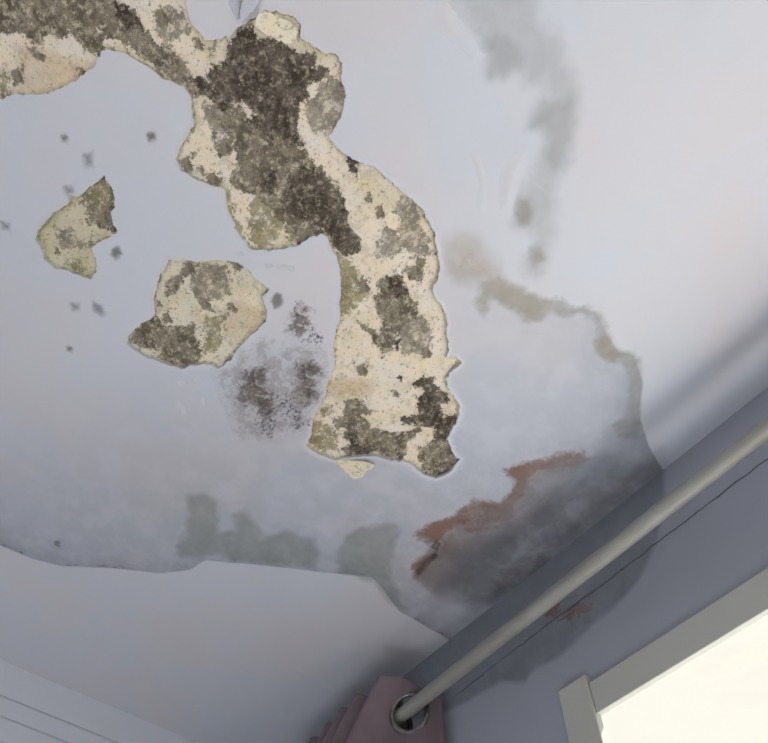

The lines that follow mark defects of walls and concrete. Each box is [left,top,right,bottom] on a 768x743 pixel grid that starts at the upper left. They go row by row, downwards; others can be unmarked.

peeling [0,0,464,481]
damp [289,303,324,347]
damp [236,360,322,438]
rust [415,510,472,575]